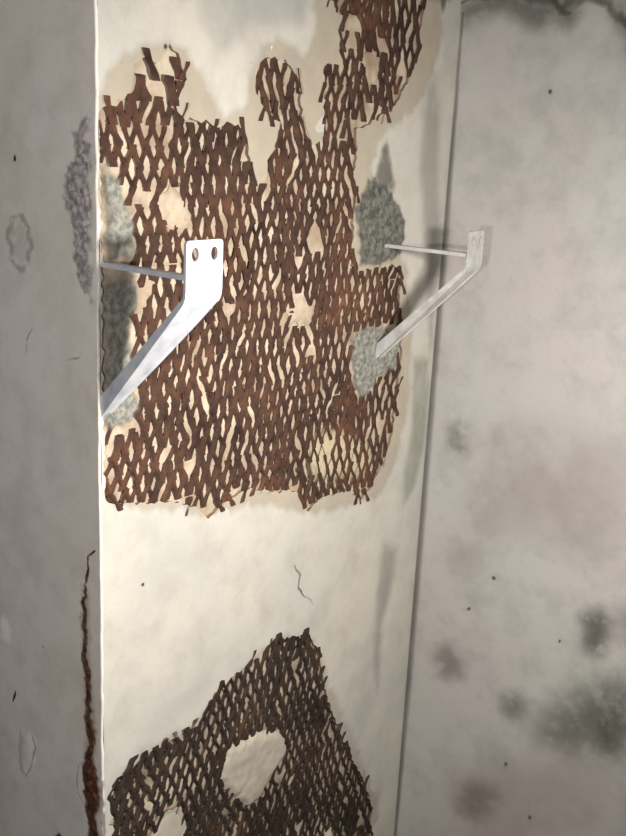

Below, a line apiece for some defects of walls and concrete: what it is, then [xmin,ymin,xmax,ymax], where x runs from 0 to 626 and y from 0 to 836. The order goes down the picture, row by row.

spalling [65,0,427,516]
spalling [107,627,374,836]